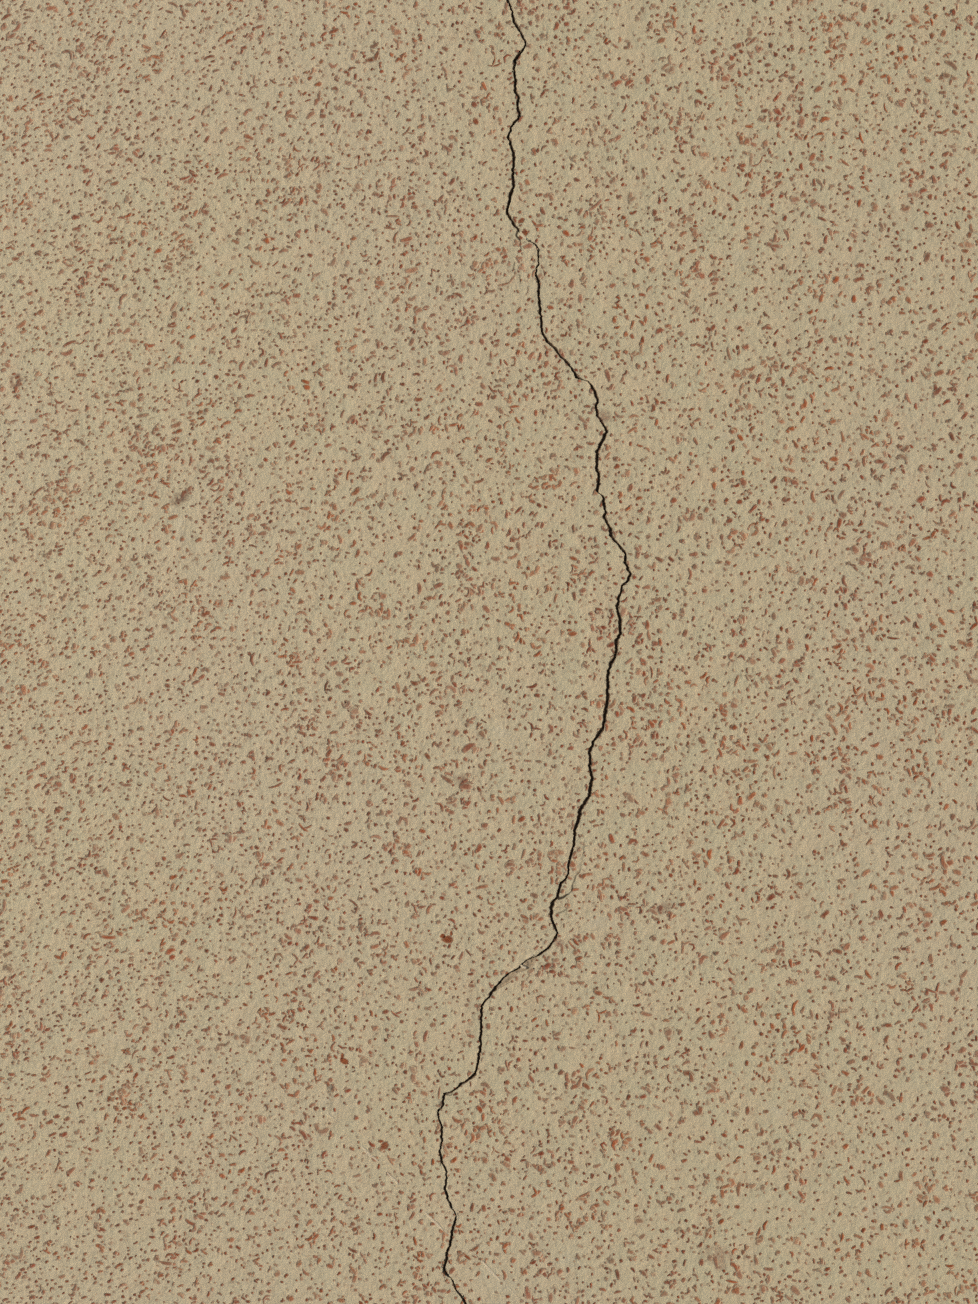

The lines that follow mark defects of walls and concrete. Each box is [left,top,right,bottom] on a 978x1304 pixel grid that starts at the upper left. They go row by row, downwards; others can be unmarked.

crack [437,0,632,1304]